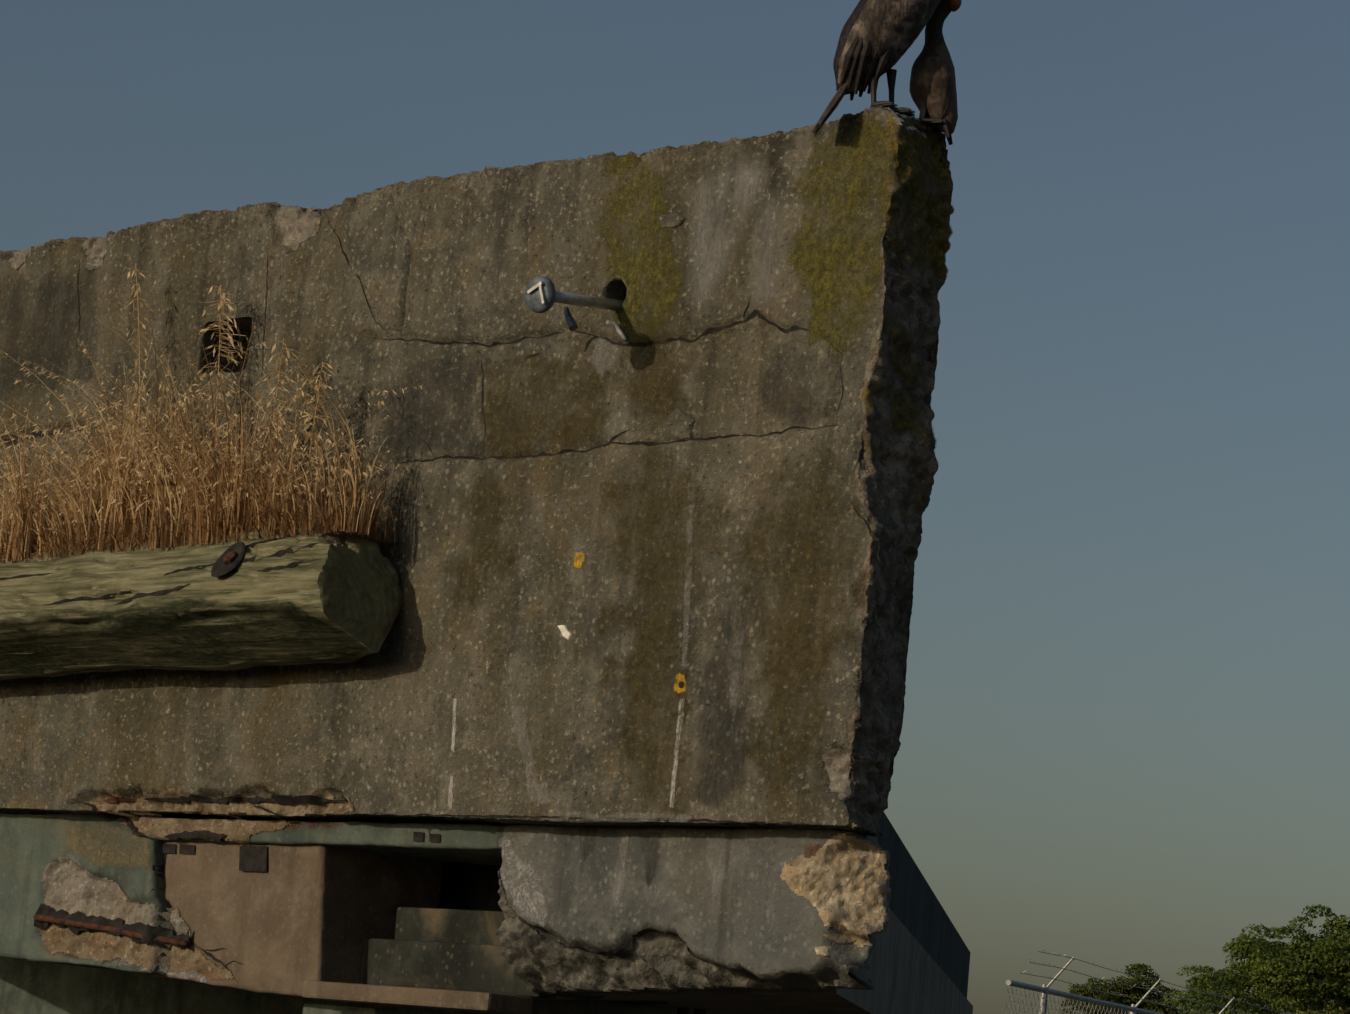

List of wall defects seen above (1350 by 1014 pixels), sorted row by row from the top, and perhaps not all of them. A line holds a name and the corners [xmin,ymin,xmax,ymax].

spalling [33,857,233,982]
spalling [495,833,889,993]